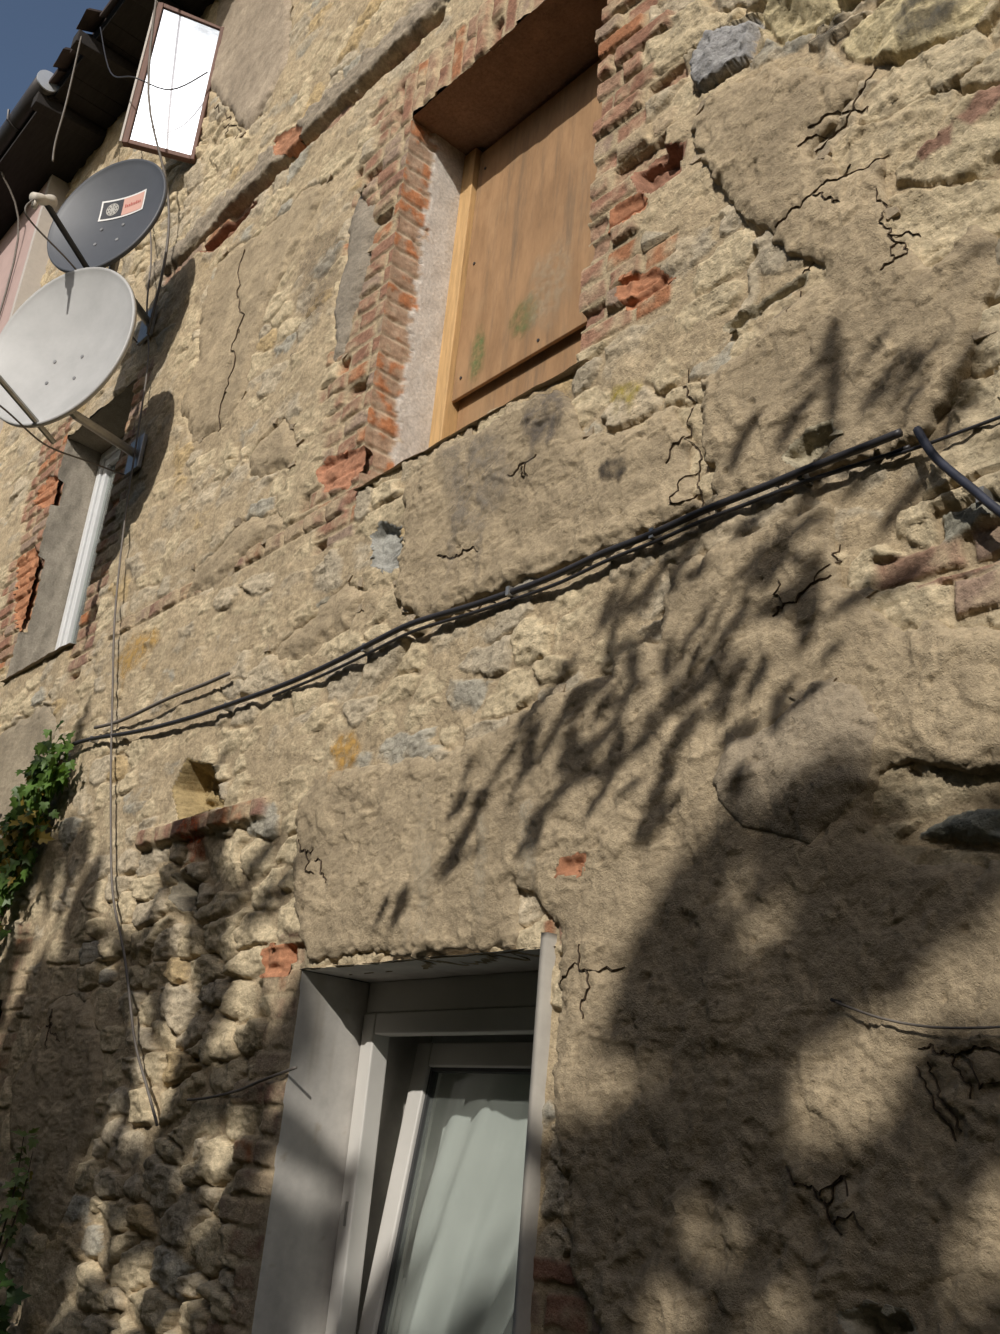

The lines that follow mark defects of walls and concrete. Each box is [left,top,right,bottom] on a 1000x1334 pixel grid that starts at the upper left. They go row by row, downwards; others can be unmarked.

crack [775,69,921,271]
spalling [33,476,59,509]
spalling [13,547,40,632]
spalling [172,757,225,820]
spalling [168,867,203,912]
flaking render [9,988,104,1244]
crack [916,1043,1000,1141]